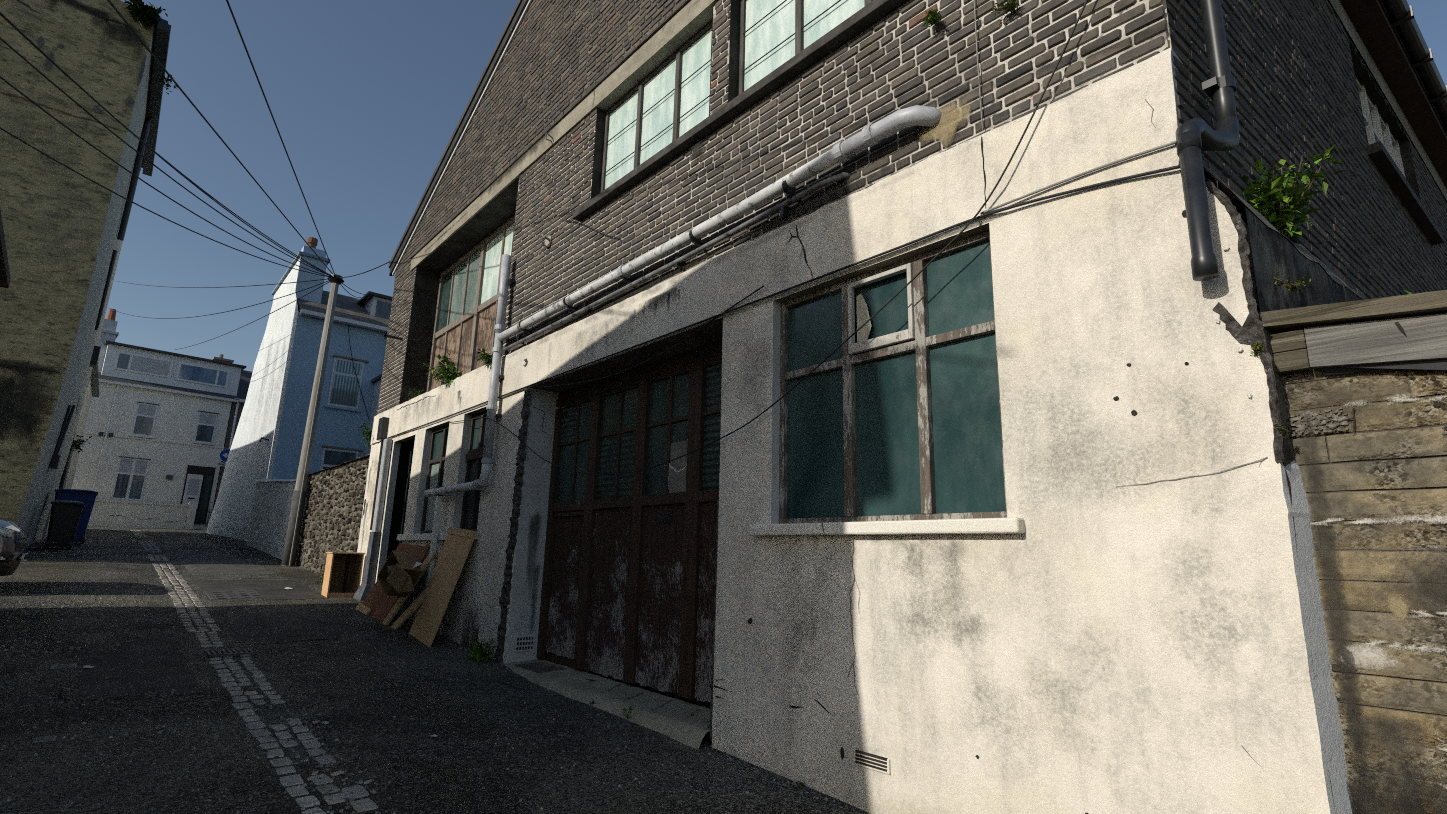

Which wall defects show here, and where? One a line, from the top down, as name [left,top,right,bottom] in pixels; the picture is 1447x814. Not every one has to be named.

damp [0,360,57,447]
crack [785,225,813,279]
spalling [1205,179,1349,462]
spalling [710,495,719,739]
crack [822,523,860,698]
damp [1309,471,1447,814]